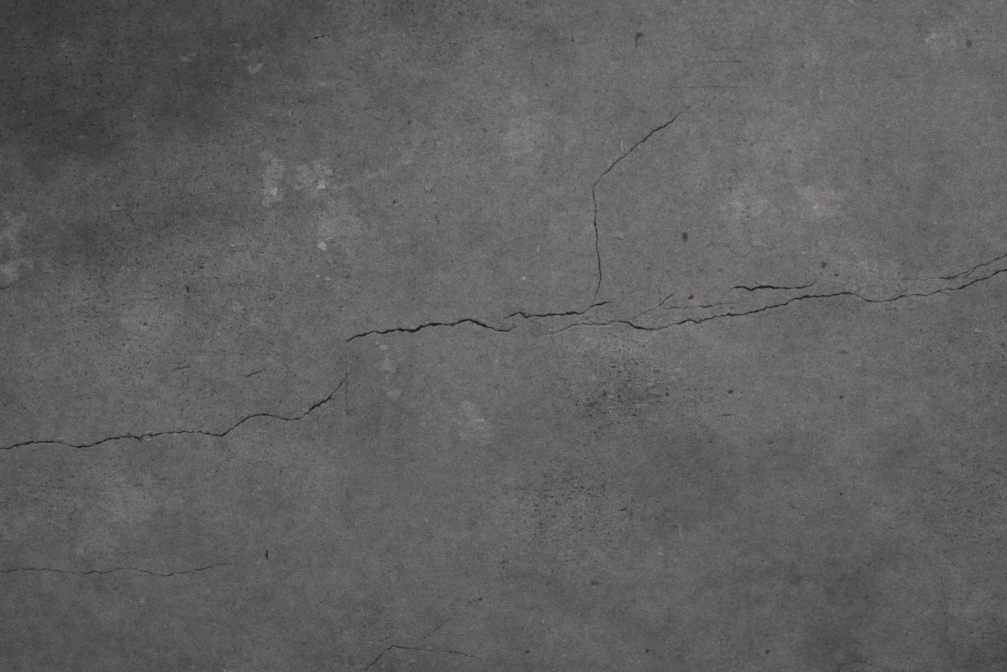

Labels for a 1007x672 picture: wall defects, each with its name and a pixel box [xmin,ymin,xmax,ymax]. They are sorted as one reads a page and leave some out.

crack [607,107,689,172]
crack [346,220,1007,343]
crack [0,373,350,453]